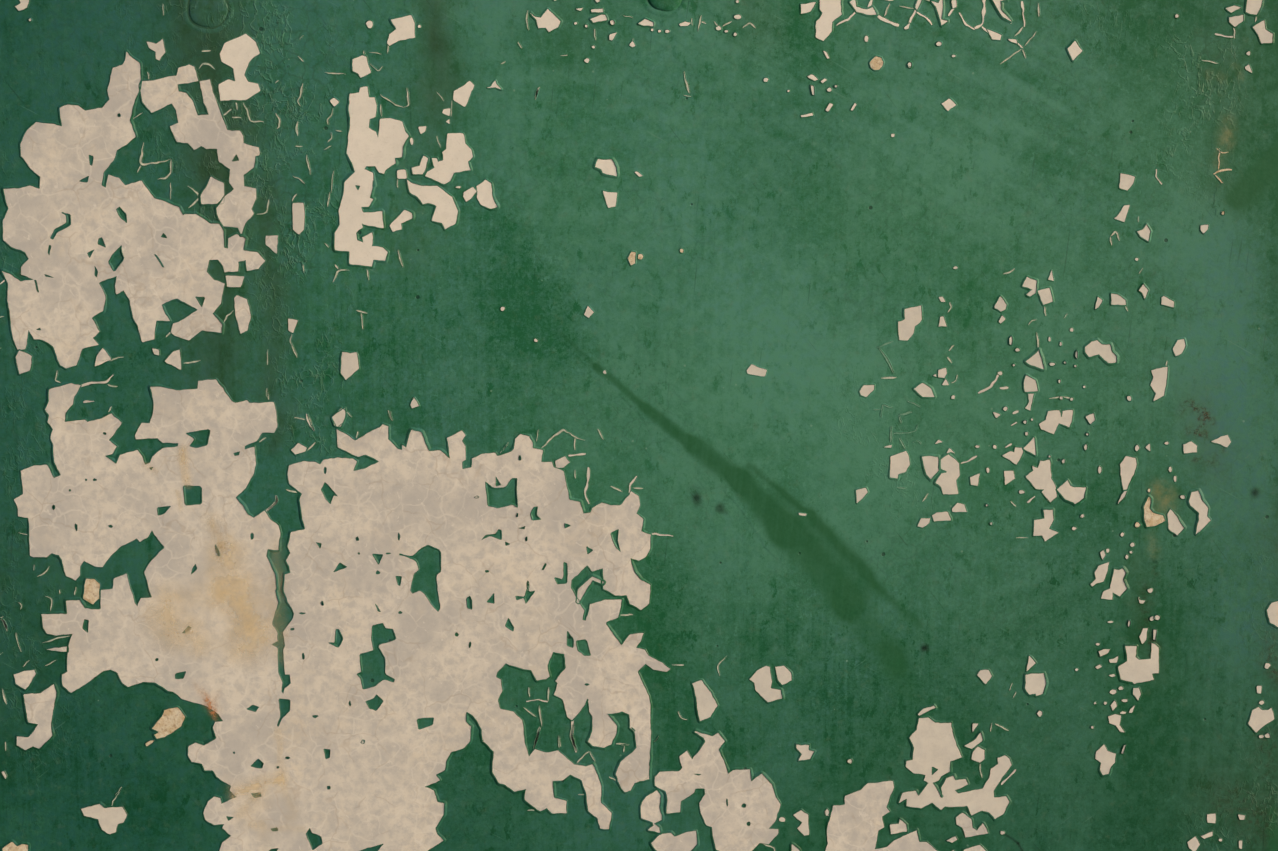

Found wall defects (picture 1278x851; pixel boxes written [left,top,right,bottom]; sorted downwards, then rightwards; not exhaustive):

peeling [365,13,422,54]
peeling [517,0,691,64]
peeling [1065,39,1084,63]
peeling [1094,257,1175,312]
peeling [1149,337,1188,403]
peeling [883,268,1120,542]
peeling [0,33,1017,851]
peeling [1116,434,1232,505]
peeling [1166,466,1212,537]